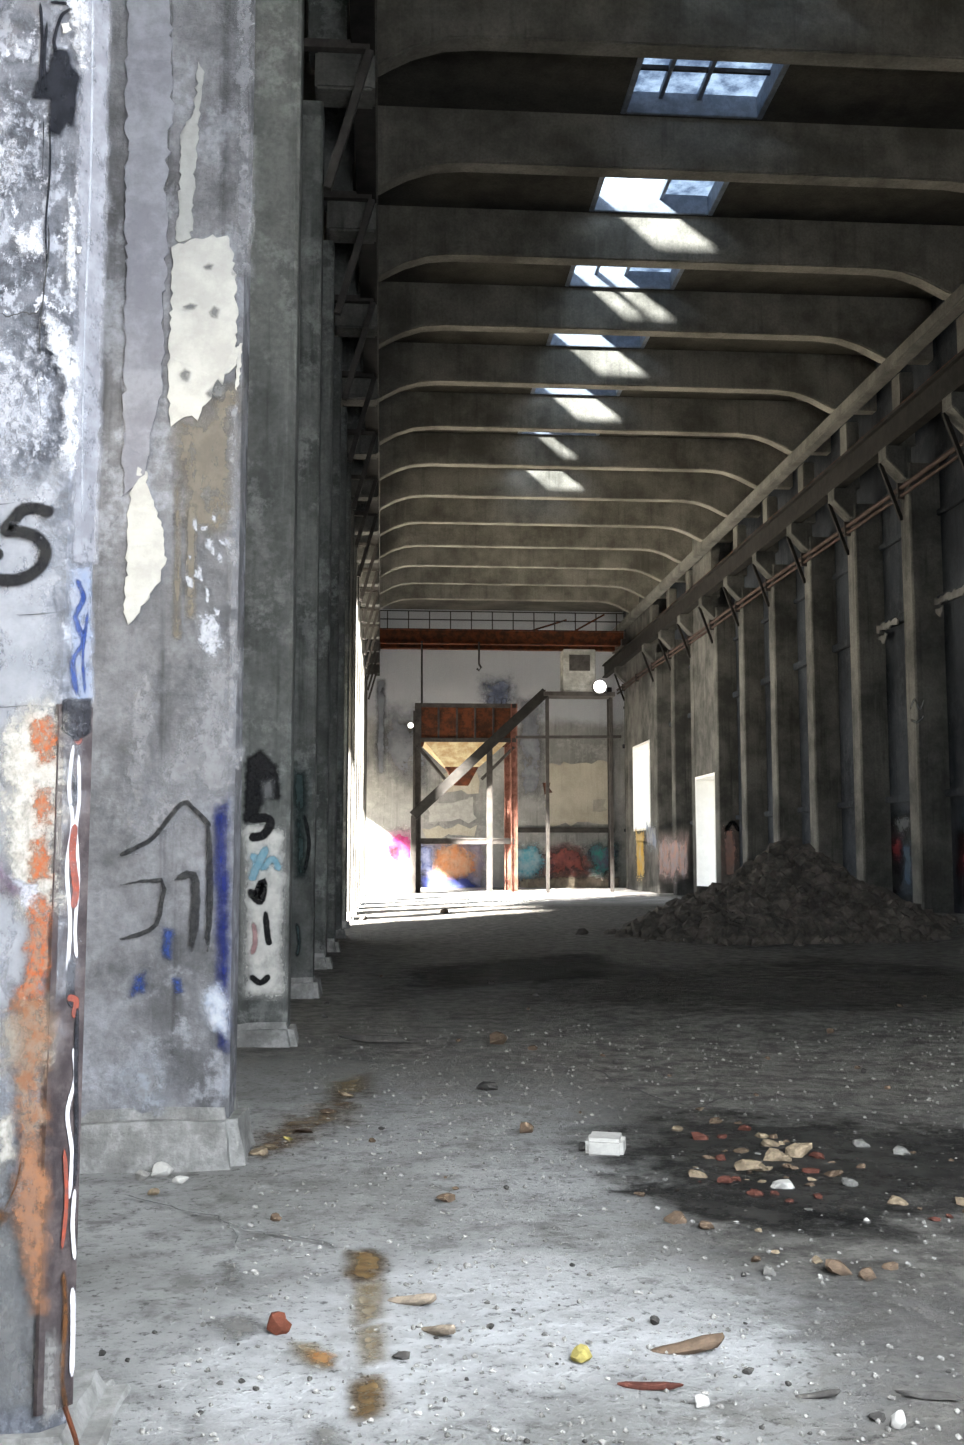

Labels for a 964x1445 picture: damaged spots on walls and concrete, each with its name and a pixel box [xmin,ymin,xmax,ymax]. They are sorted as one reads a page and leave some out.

peeling [0,0,243,625]
peeling [0,702,68,920]
rust [29,716,58,764]
peeling [0,1114,15,1162]
peeling [0,1003,55,1073]
rust [0,787,55,1313]